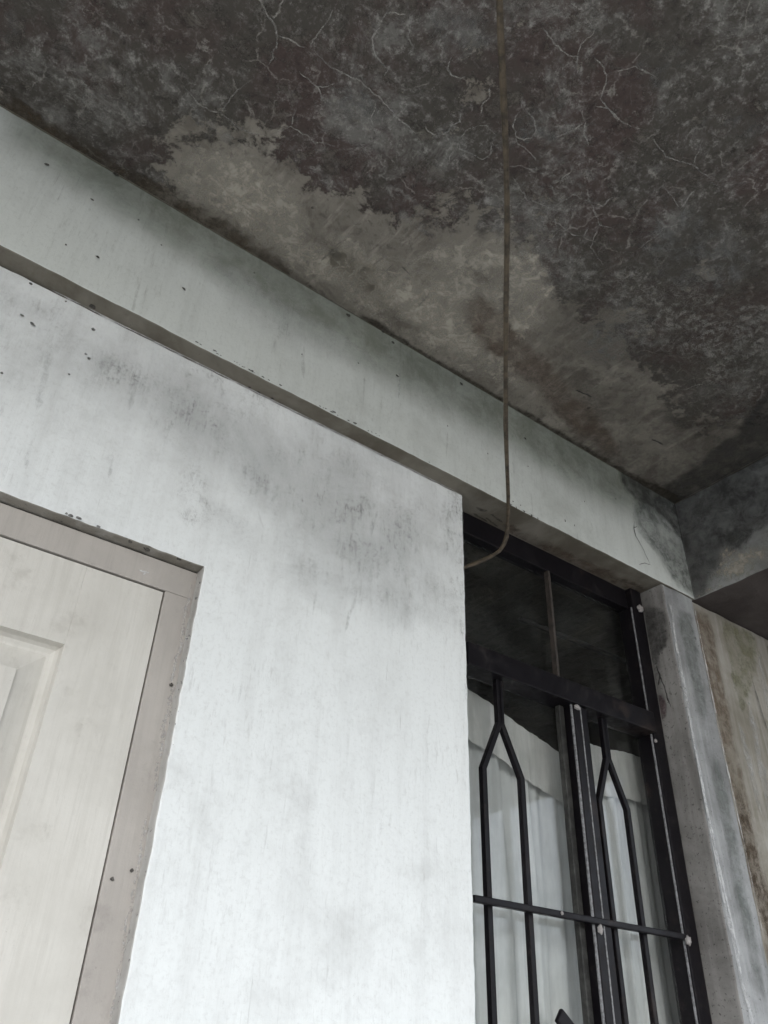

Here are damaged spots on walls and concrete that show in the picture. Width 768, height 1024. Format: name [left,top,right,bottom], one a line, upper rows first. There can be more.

crack [259,0,492,160]
crack [512,30,654,145]
crack [513,168,611,264]
water stain [0,0,768,597]
water stain [645,606,716,712]
water stain [696,755,763,938]